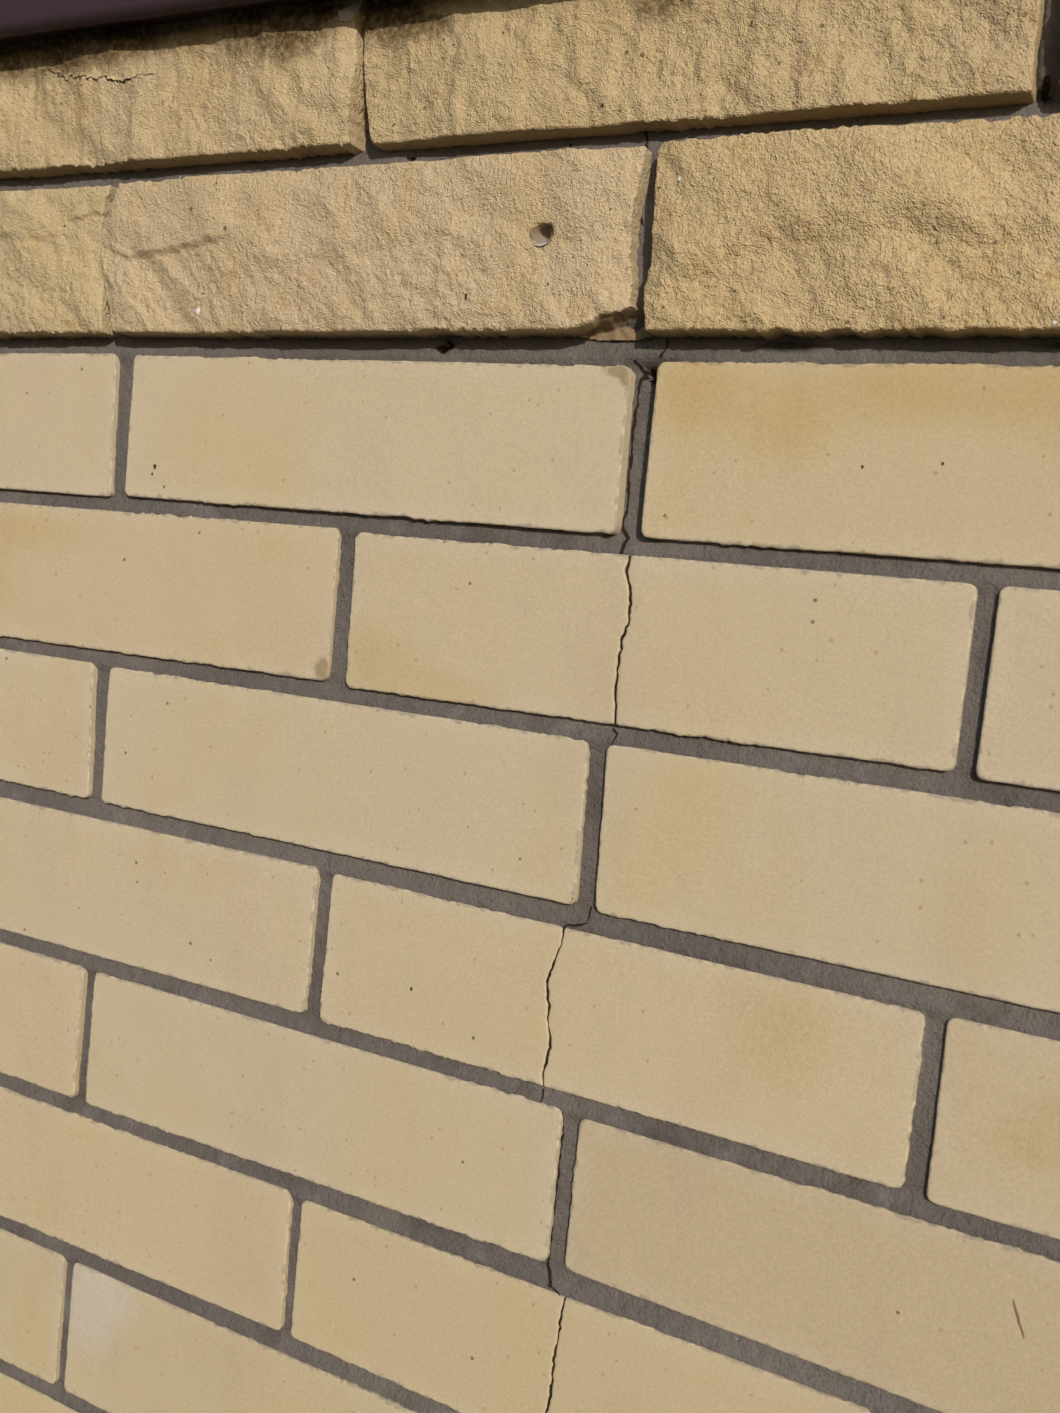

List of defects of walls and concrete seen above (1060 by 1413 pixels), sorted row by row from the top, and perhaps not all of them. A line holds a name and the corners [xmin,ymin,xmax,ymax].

crack [612,339,669,744]
crack [539,907,592,1413]